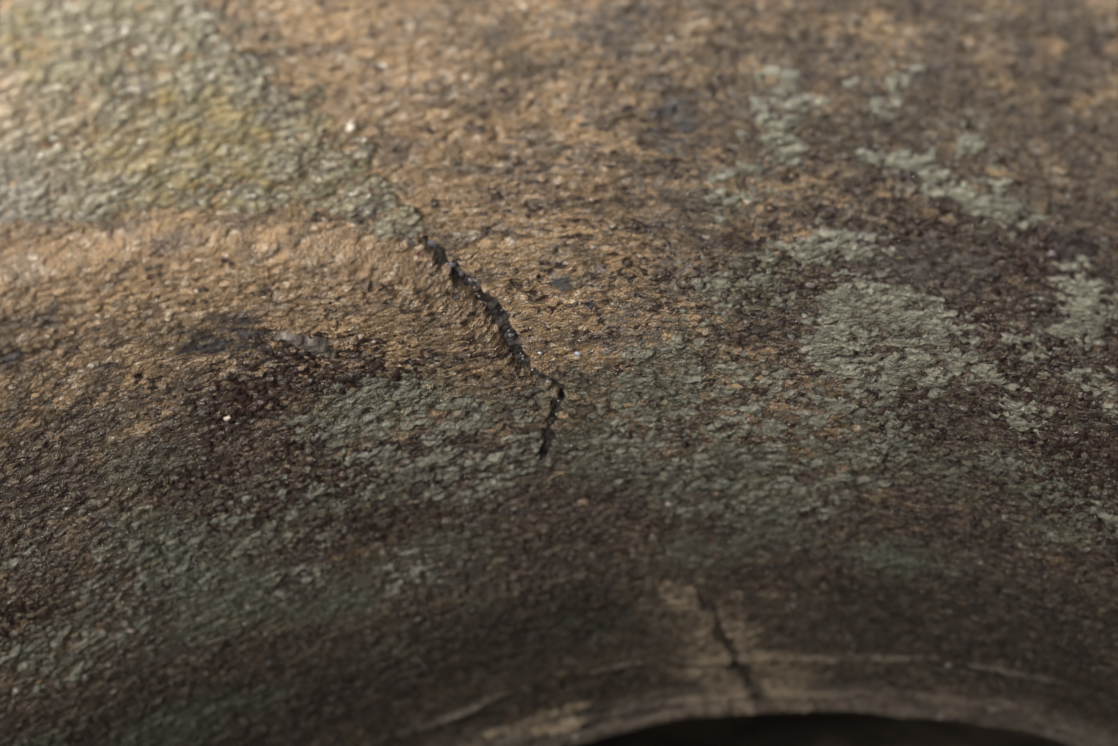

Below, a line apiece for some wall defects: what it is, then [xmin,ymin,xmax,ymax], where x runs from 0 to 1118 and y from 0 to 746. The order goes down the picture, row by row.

crack [407,233,564,458]
crack [686,581,762,708]